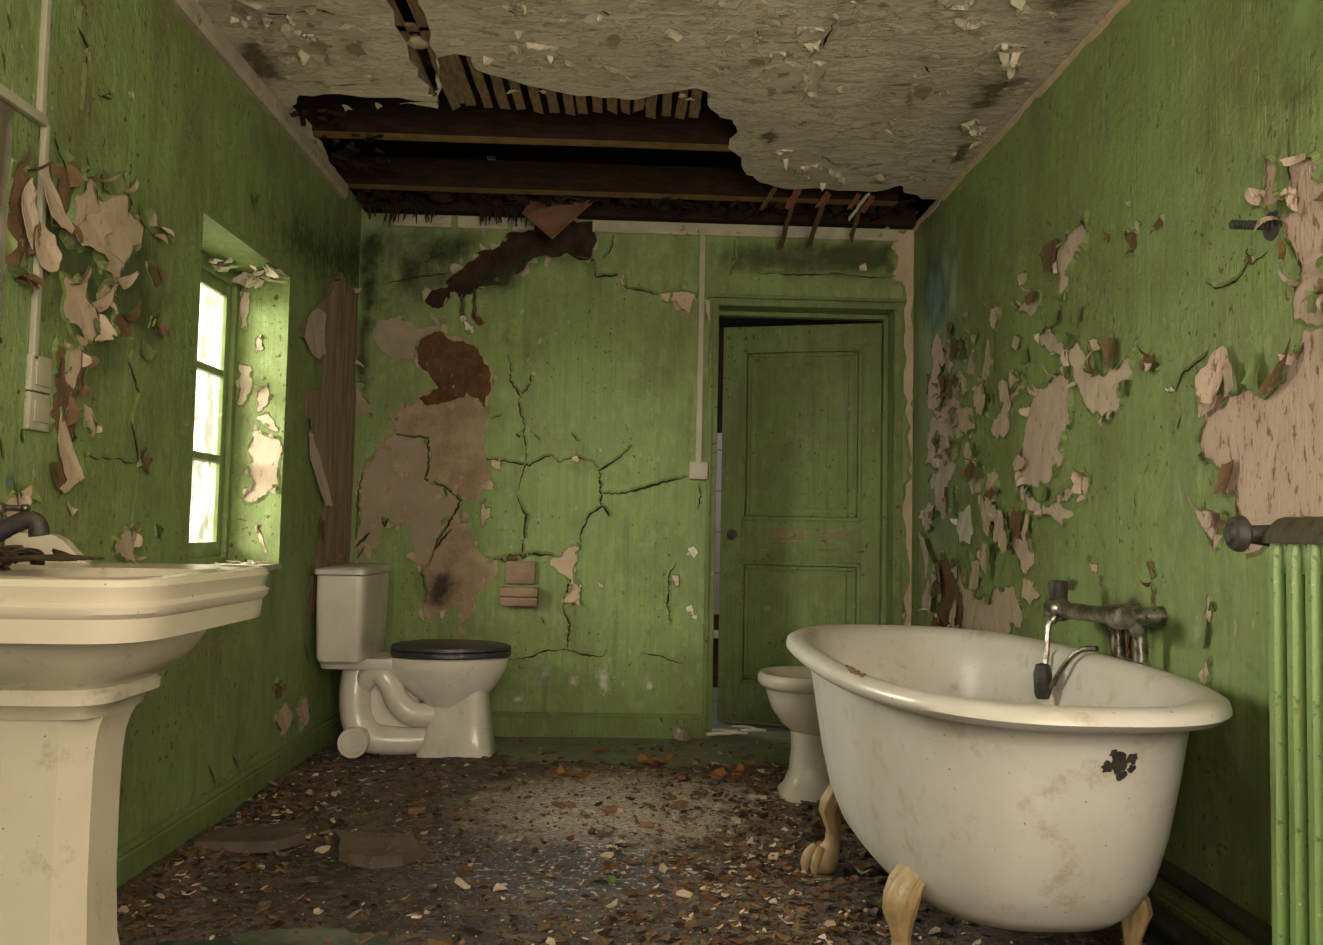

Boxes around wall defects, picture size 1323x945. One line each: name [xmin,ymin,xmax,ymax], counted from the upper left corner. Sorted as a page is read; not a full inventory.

peeling [230,0,369,66]
peeling [472,0,640,94]
peeling [607,0,906,117]
peeling [775,53,989,191]
peeling [978,36,1032,94]
peeling [1011,0,1033,15]
peeling [0,137,175,519]
peeling [1188,137,1323,555]
spalling [272,218,599,740]
crack [485,354,703,664]
peeling [873,200,1165,634]
peeling [1245,544,1268,559]